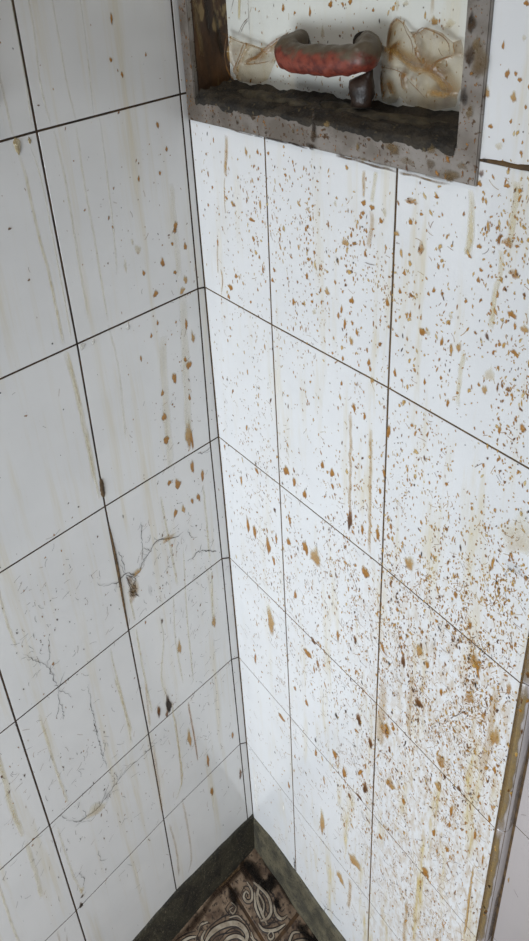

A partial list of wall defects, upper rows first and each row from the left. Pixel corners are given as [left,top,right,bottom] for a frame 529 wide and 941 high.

crack [98,530,216,598]
corrosion [201,8,529,941]